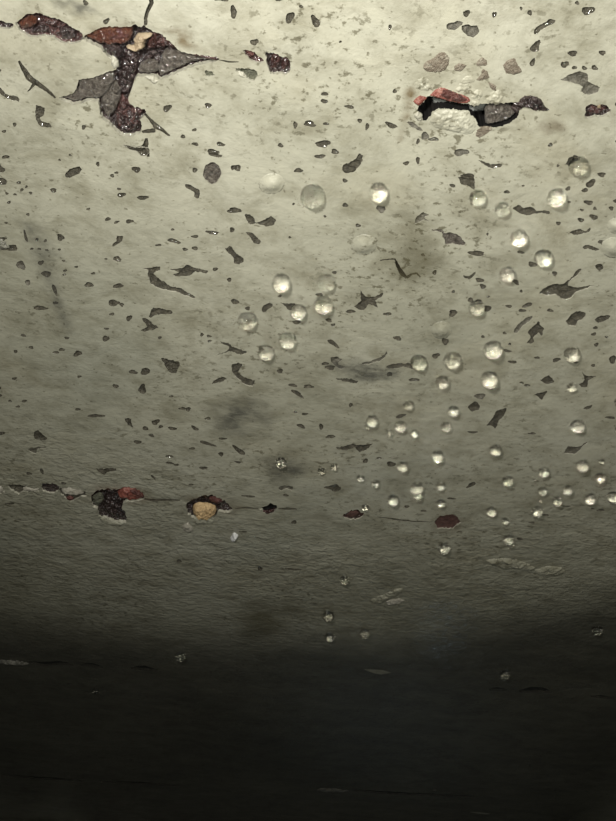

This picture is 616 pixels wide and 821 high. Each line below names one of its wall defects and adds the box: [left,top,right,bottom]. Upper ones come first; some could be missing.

spalling [0,13,219,157]
peeling [423,52,496,91]
peeling [503,58,522,75]
peeling [469,103,514,124]
spalling [0,484,39,495]
spalling [59,487,144,527]
spalling [182,495,233,532]
corrosion [435,514,461,529]